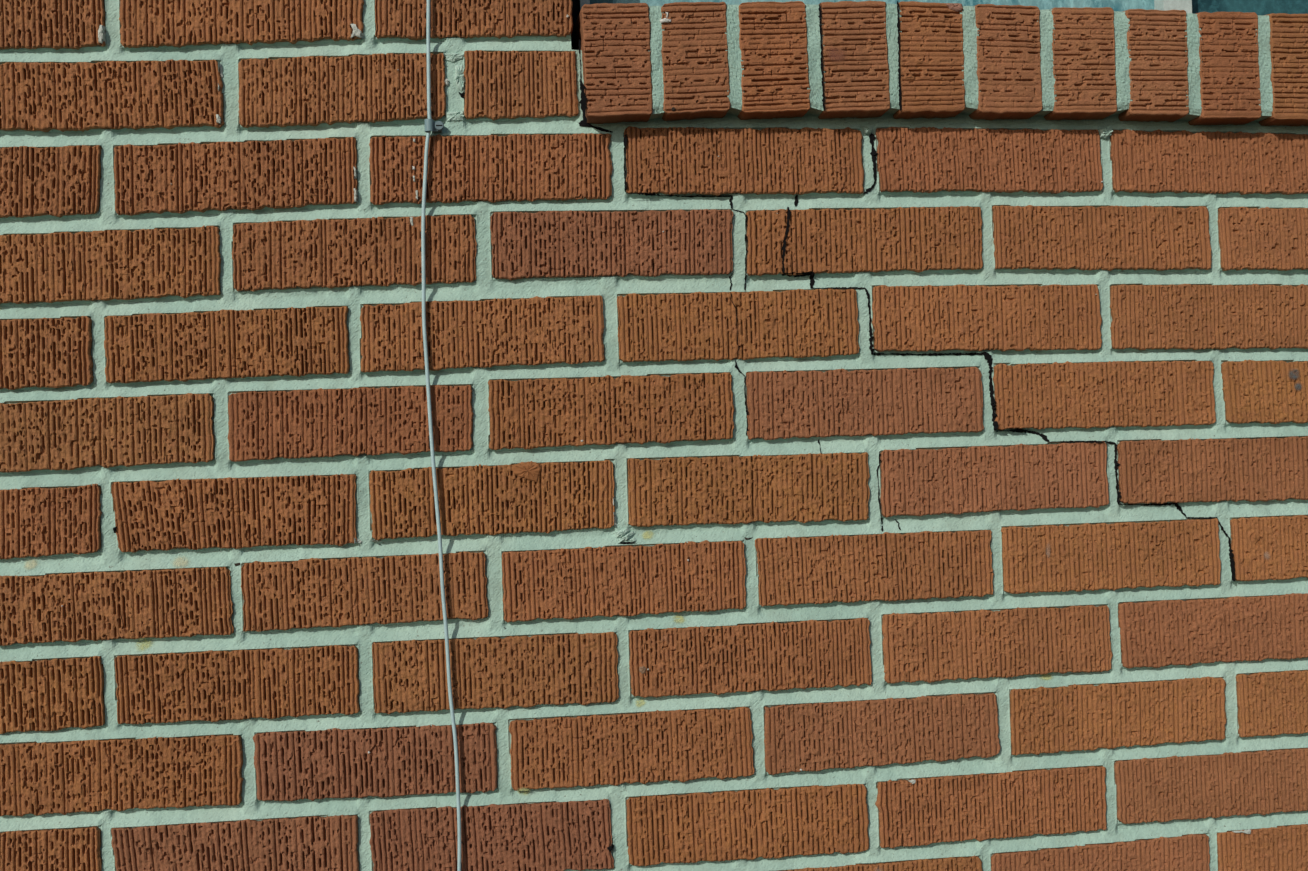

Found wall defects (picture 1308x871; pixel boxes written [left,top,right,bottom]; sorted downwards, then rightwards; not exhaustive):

crack [623,134,748,436]
crack [863,133,878,194]
crack [782,195,1235,582]